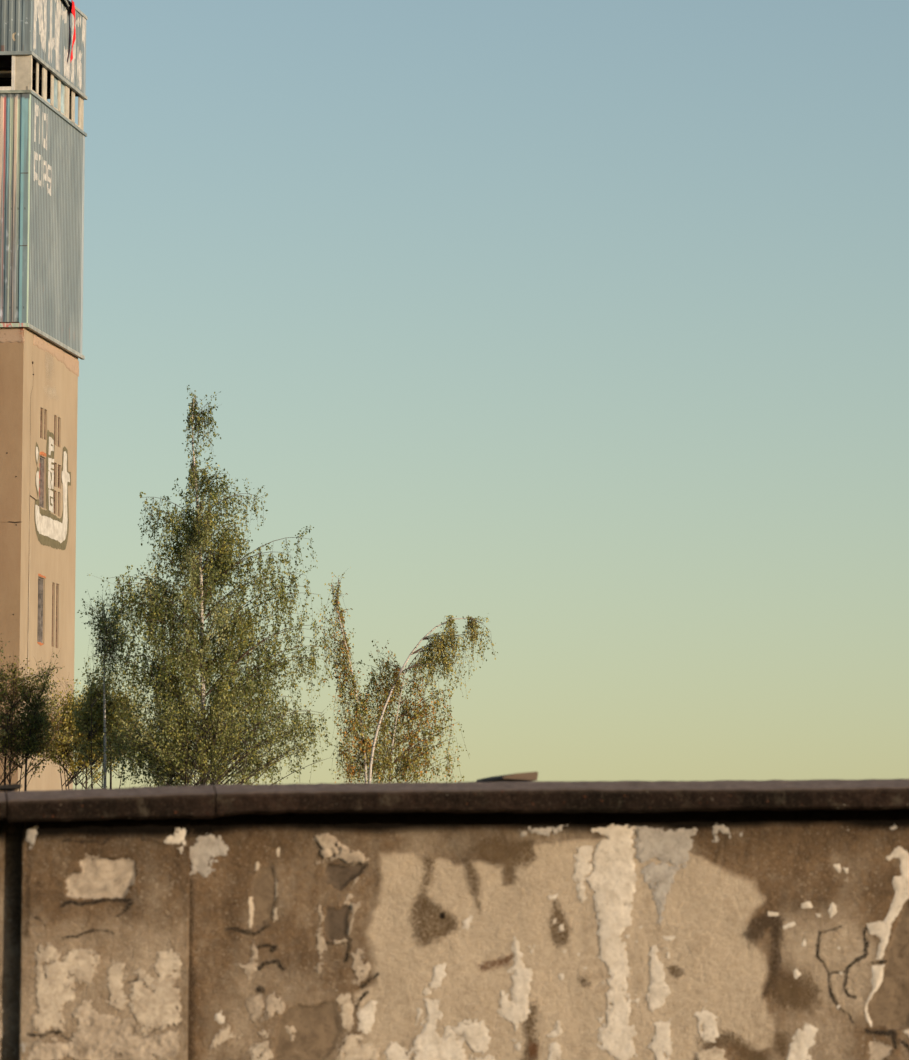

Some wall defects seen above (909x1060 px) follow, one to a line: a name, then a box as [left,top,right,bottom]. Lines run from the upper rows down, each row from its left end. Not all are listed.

flaking render [65,853,136,900]
peeling [20,942,183,1060]
peeling [164,827,229,878]
flaking render [235,832,495,1060]
damp [404,854,460,949]
peeling [572,824,697,1060]
peeling [689,1000,727,1060]
peeling [712,825,742,842]
damp [740,908,824,1013]
peeling [787,1022,819,1060]
crack [815,925,909,1052]
flaking render [864,846,909,1060]